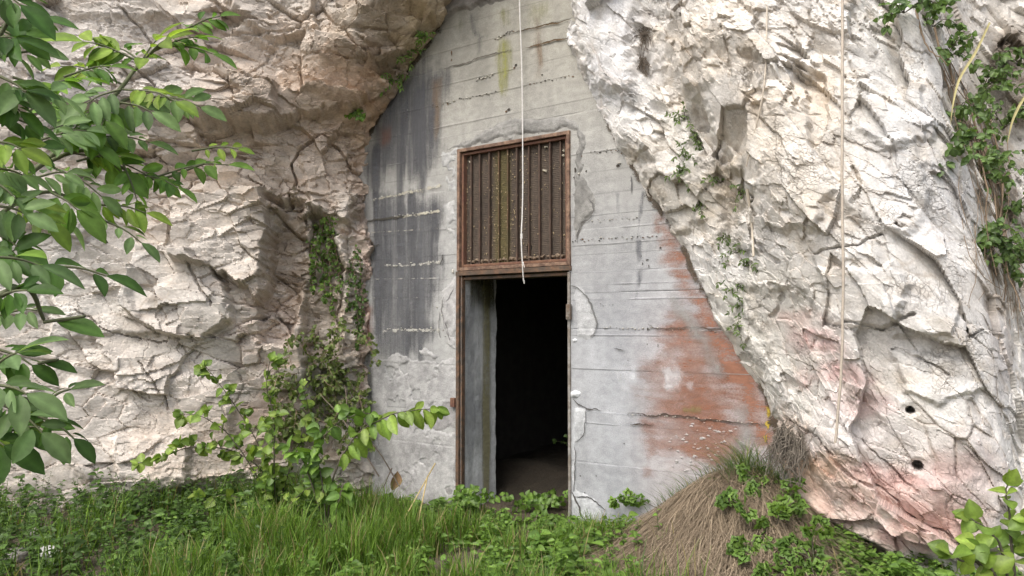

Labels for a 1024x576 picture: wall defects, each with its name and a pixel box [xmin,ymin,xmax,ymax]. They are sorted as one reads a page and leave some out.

water stain [367,62,450,361]
crack [572,399,605,515]
crack [633,413,772,426]
rust [658,230,774,445]